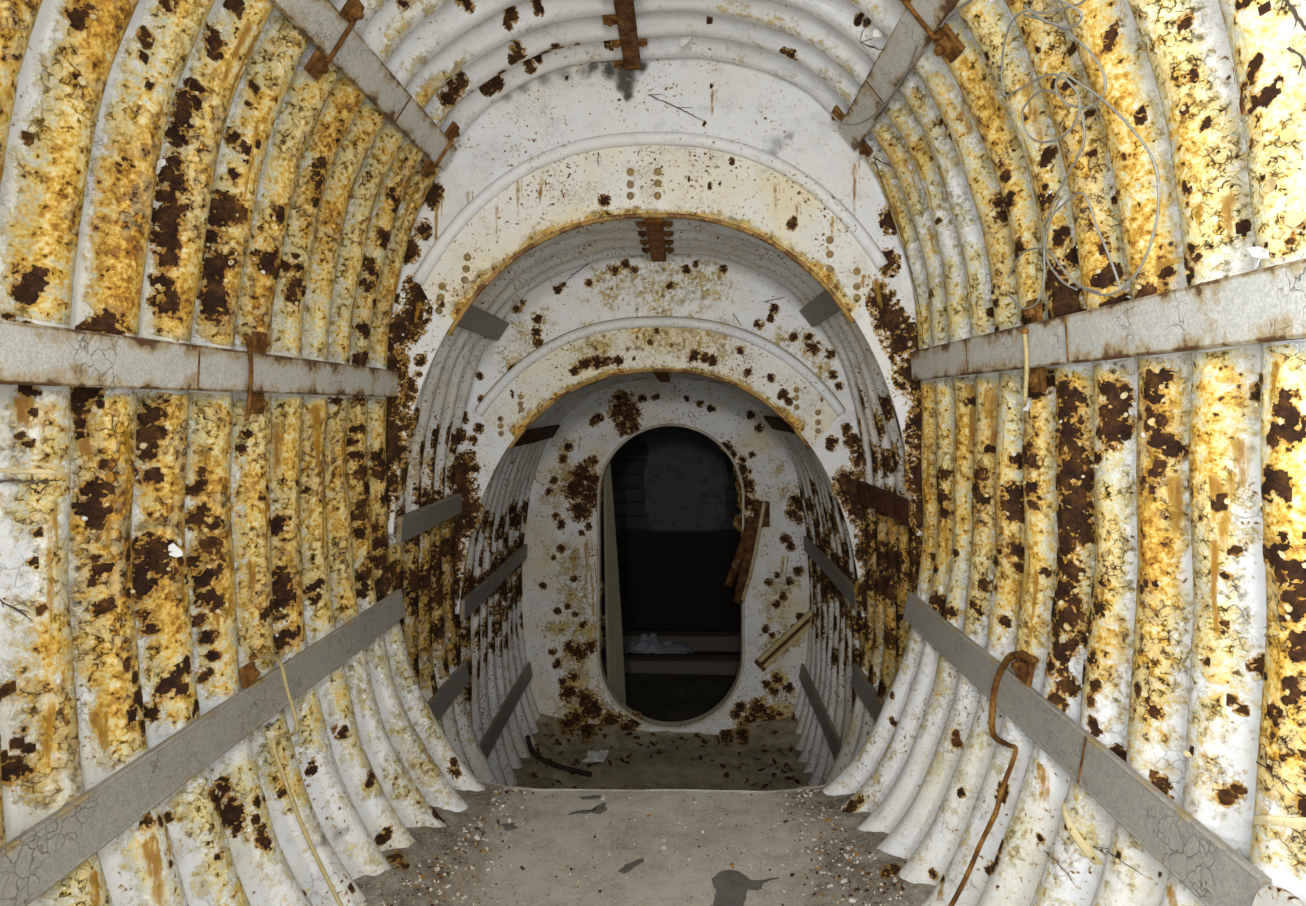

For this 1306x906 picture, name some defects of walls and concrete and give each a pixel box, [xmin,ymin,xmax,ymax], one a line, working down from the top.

rust [0,0,442,366]
rust [415,206,857,322]
rust [510,256,805,437]
rust [852,0,1306,350]
peeling [1249,373,1306,512]
rust [0,385,481,906]
rust [841,344,1306,876]
peeling [1262,530,1306,706]
peeling [0,734,34,786]
rust [919,857,945,899]
rust [927,728,1097,906]
crack [1092,846,1145,877]